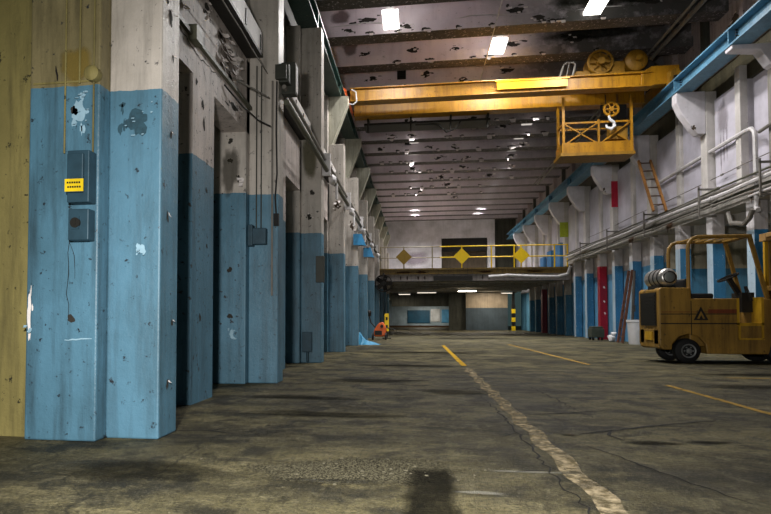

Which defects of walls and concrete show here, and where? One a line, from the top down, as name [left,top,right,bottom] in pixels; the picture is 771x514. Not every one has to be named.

peeling [71,90,89,136]
peeling [118,101,153,136]
crack [482,381,752,514]